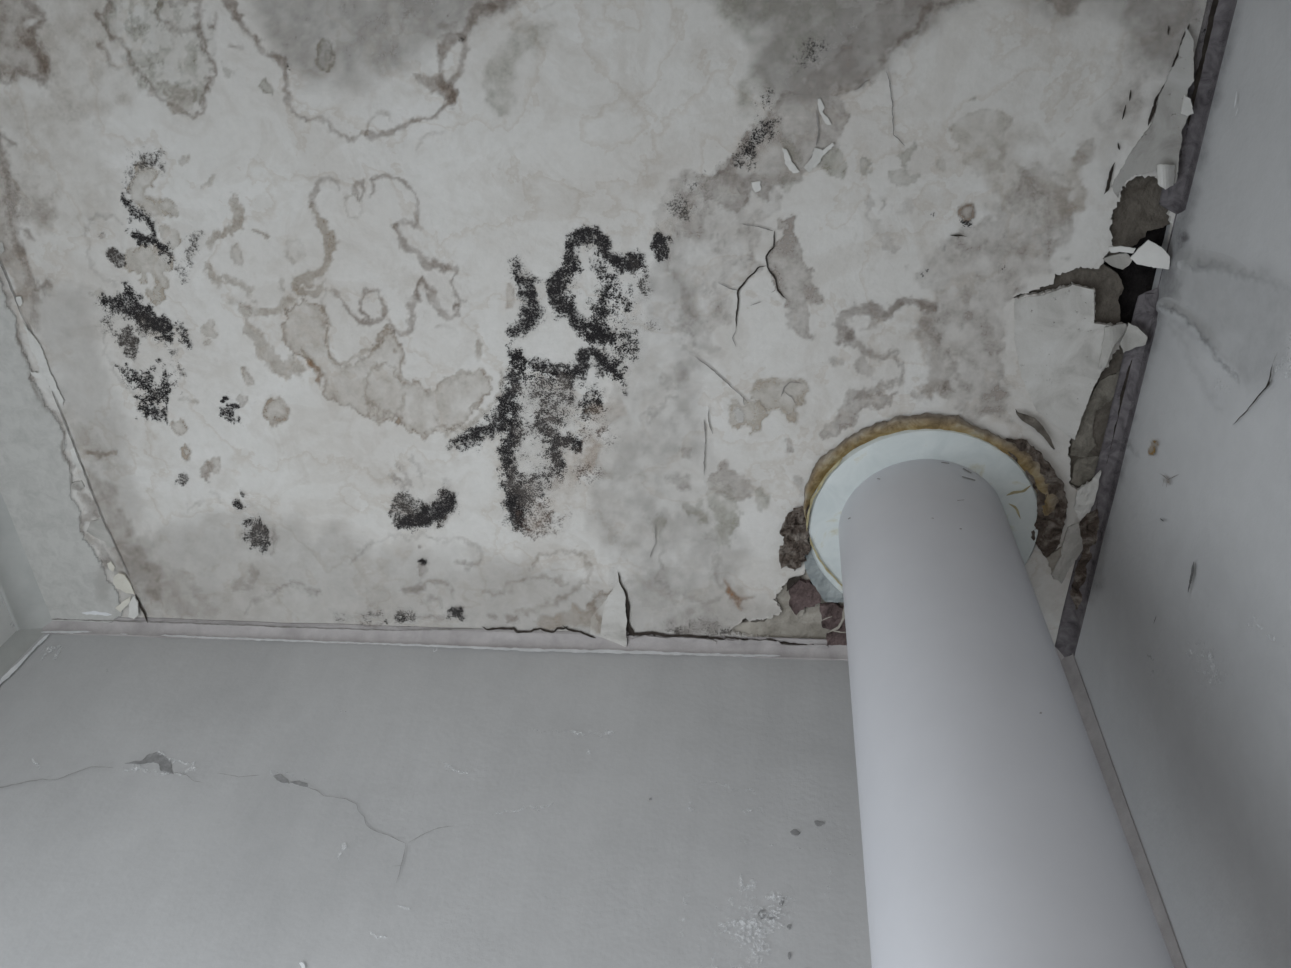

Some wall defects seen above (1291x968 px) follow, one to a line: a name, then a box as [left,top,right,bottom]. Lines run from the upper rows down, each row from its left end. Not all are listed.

peeling [0,631,89,685]
peeling [82,519,139,619]
water stain [96,247,209,486]
water stain [120,148,202,285]
crack [46,379,595,638]
water stain [388,487,457,532]
flaking render [161,505,847,657]
water stain [448,225,672,534]
crack [703,412,713,471]
crack [627,631,814,645]
crack [718,186,785,346]
peeling [1006,27,1194,610]